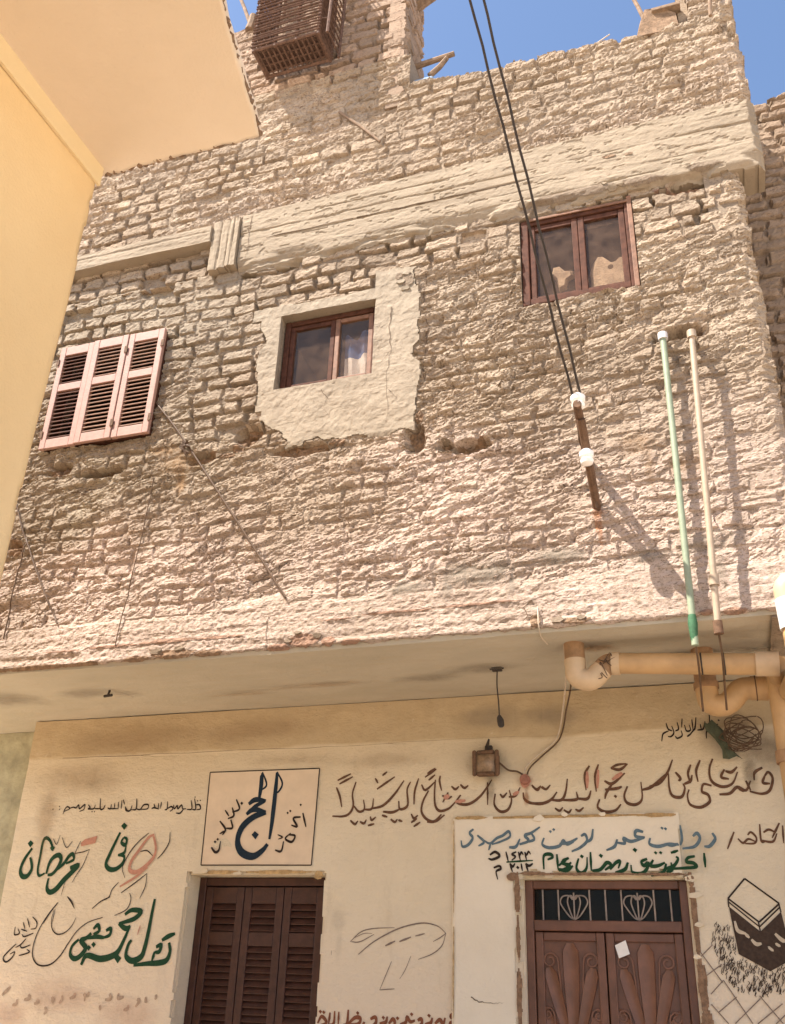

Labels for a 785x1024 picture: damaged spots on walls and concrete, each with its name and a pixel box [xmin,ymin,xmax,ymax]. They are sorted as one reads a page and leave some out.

crack [381,307,397,414]
spalling [273,438,346,458]